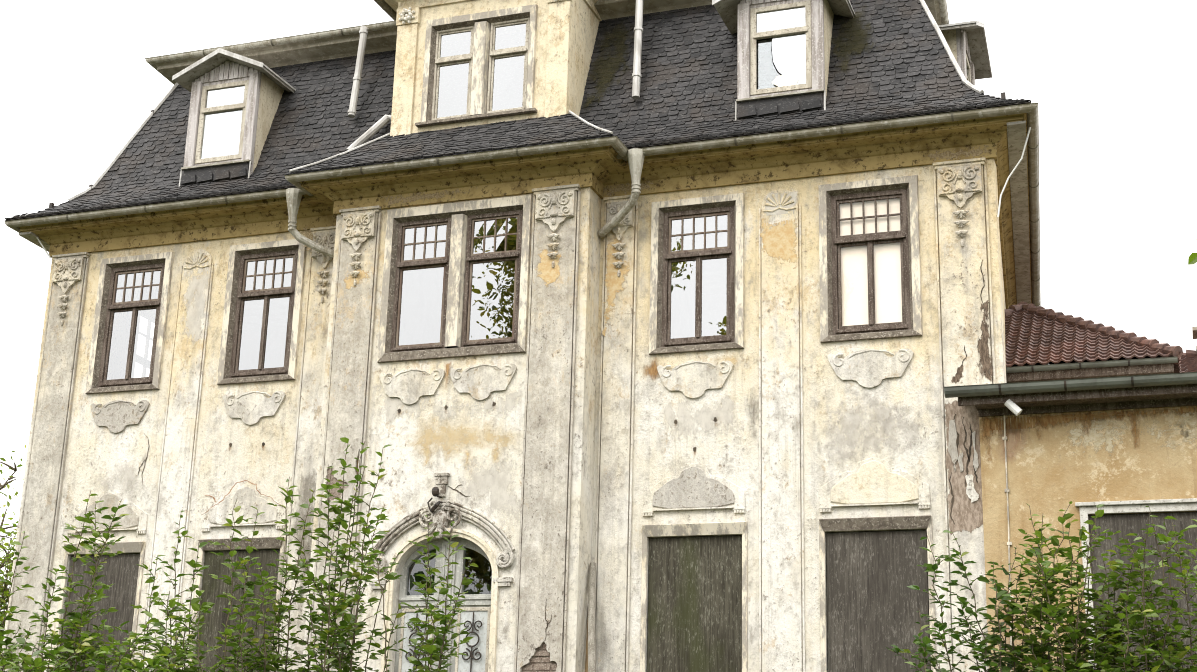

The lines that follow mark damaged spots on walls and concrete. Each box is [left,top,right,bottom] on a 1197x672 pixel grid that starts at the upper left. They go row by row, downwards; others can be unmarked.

peeling [760,191,799,263]
spalling [951,260,993,383]
spalling [326,458,359,508]
damp [419,427,510,463]
peeling [945,400,983,535]
spalling [521,642,563,672]